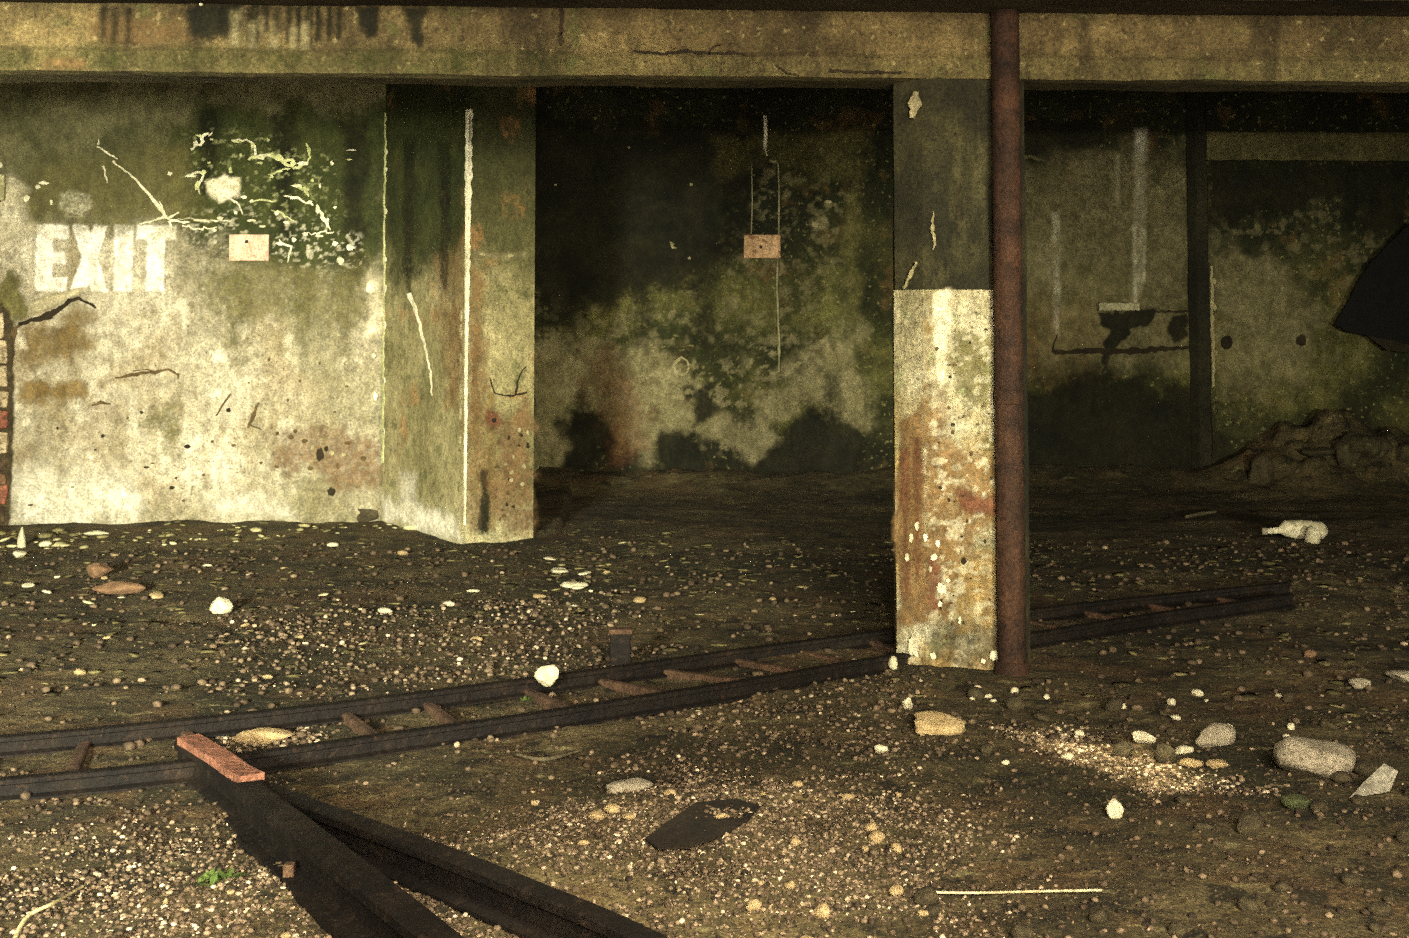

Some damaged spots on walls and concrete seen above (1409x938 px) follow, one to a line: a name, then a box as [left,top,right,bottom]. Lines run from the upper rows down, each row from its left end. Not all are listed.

leakage [187,4,378,49]
peeling [190,132,213,150]
leakage [31,99,471,349]
peeling [167,138,354,265]
leakage [534,112,862,349]
crack [11,296,96,367]
spalling [259,113,388,496]
crack [92,368,179,406]
leakage [555,391,610,471]
leakage [657,385,718,470]
leakage [748,377,864,473]
corrosion [893,406,996,625]